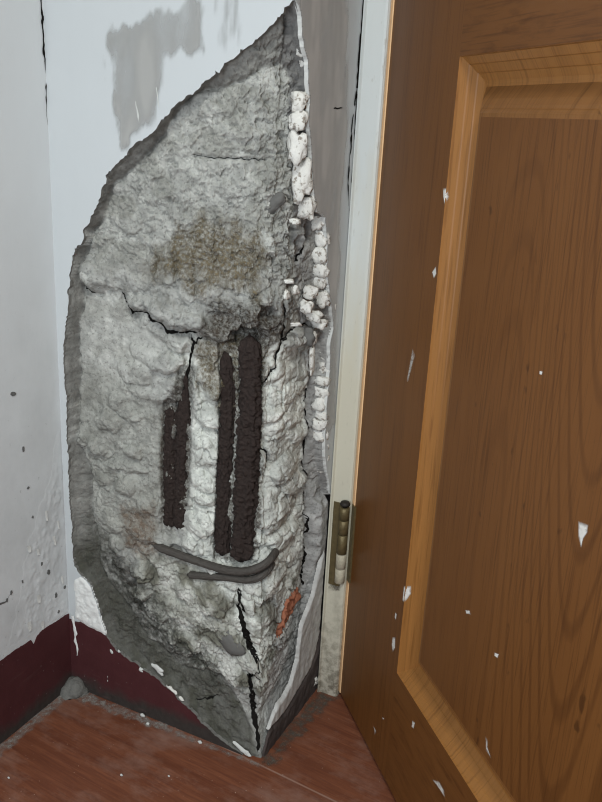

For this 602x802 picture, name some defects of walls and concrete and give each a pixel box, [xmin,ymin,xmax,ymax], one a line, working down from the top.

crack [40,0,48,125]
spalling [65,0,348,758]
rust [151,218,285,517]
crack [236,588,260,752]